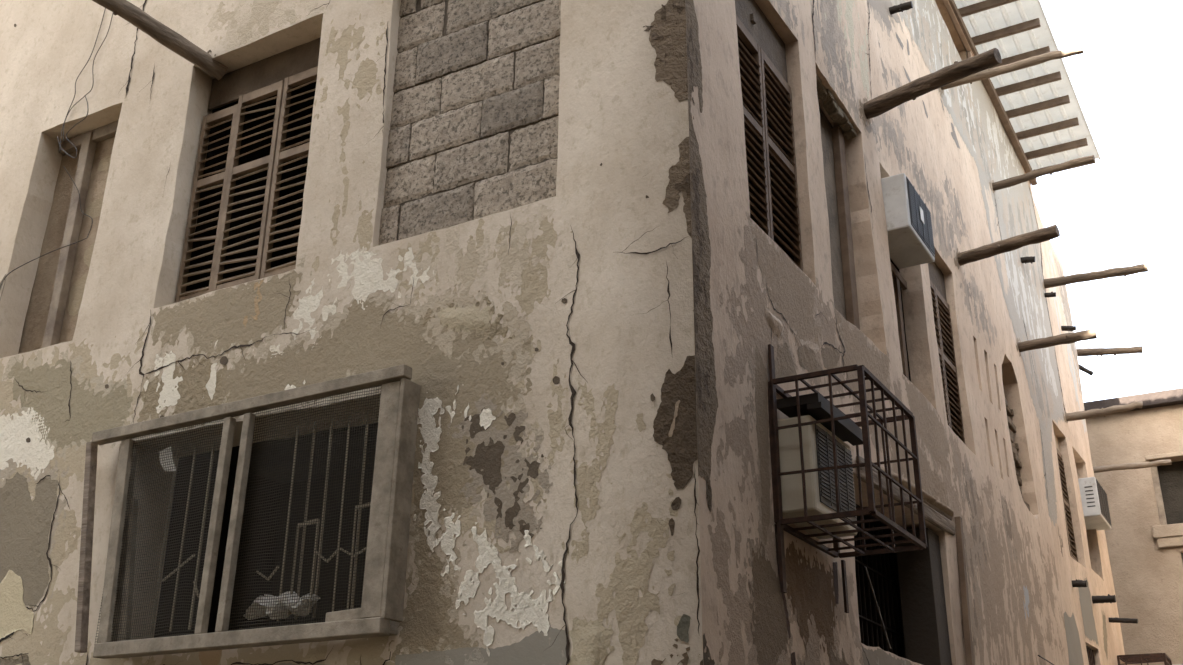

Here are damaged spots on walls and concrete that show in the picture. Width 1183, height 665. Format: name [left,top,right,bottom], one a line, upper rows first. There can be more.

crack [119,0,155,99]
crack [810,0,818,55]
flaking render [868,0,911,82]
crack [129,284,314,423]
flaking render [643,0,718,536]
crack [746,230,848,380]
flaking render [984,180,1008,287]
flaking render [0,407,59,639]
flaking render [137,246,566,662]
crack [543,228,585,665]
flaking render [0,655,31,665]
crack [231,646,334,665]